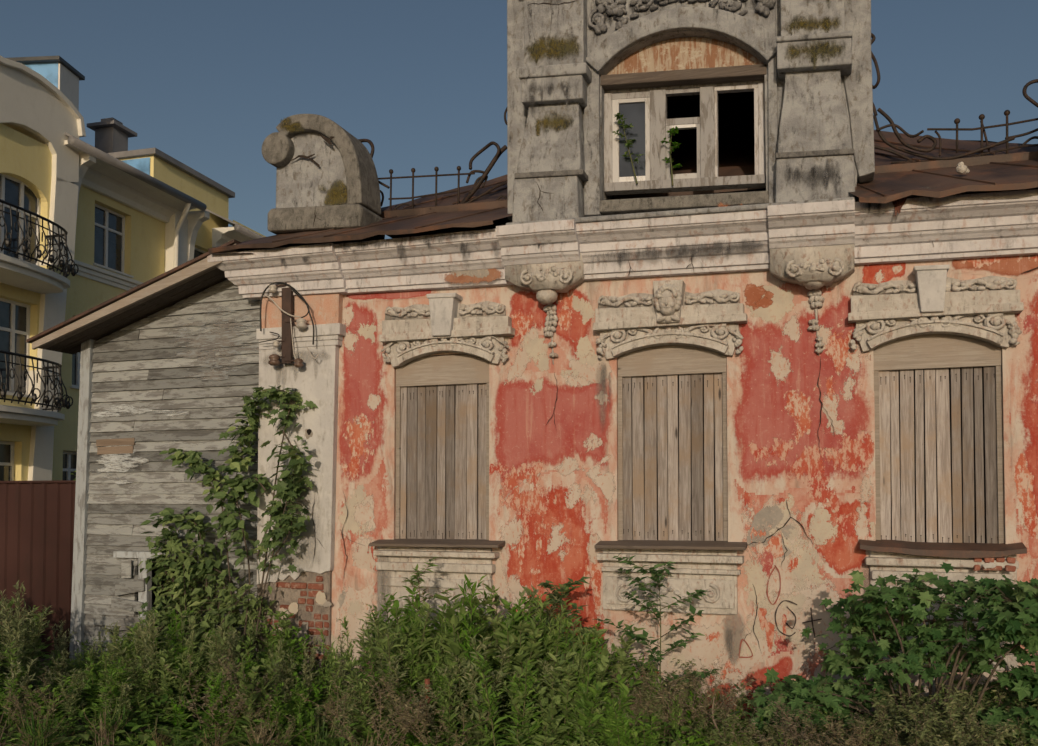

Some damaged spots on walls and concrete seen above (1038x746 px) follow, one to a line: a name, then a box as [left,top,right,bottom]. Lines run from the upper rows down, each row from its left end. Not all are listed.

leakage [790,18,830,67]
rust [891,190,907,216]
flaking render [444,268,502,284]
peeling [948,255,1038,544]
peeling [267,290,434,675]
peeling [489,262,911,719]
crack [747,500,813,565]